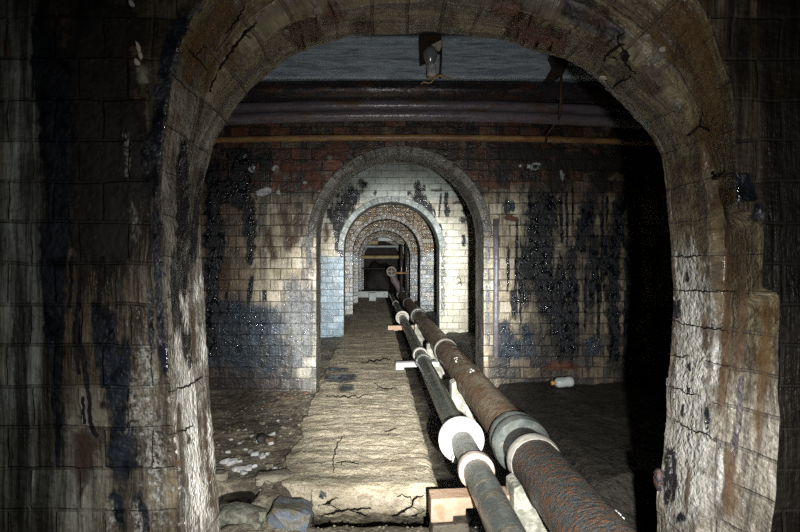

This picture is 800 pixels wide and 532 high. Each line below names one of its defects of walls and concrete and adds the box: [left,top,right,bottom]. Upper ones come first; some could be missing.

crack [179,6,257,93]
crack [602,33,636,89]
water stain [242,187,280,265]
water stain [278,210,316,276]
water stain [542,170,610,357]
water stain [246,275,270,342]
water stain [484,238,539,361]
water stain [106,170,215,532]
crack [332,438,358,473]
crack [675,419,717,442]
crack [318,498,371,517]
crack [391,493,425,517]